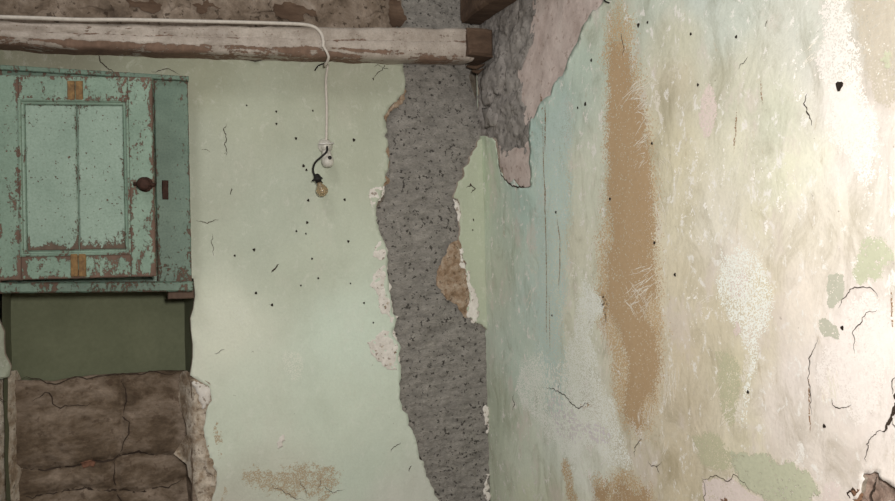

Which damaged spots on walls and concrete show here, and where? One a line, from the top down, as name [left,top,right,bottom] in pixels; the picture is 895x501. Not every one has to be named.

flaking render [0,0,407,28]
flaking render [518,0,603,125]
flaking render [369,147,390,208]
flaking render [497,141,531,188]
flaking render [367,241,401,370]
flaking render [436,240,479,324]
flaking render [0,370,217,501]
crack [864,378,895,459]
leakage [242,462,344,501]
flaking render [483,474,491,501]
peeling [702,450,895,501]